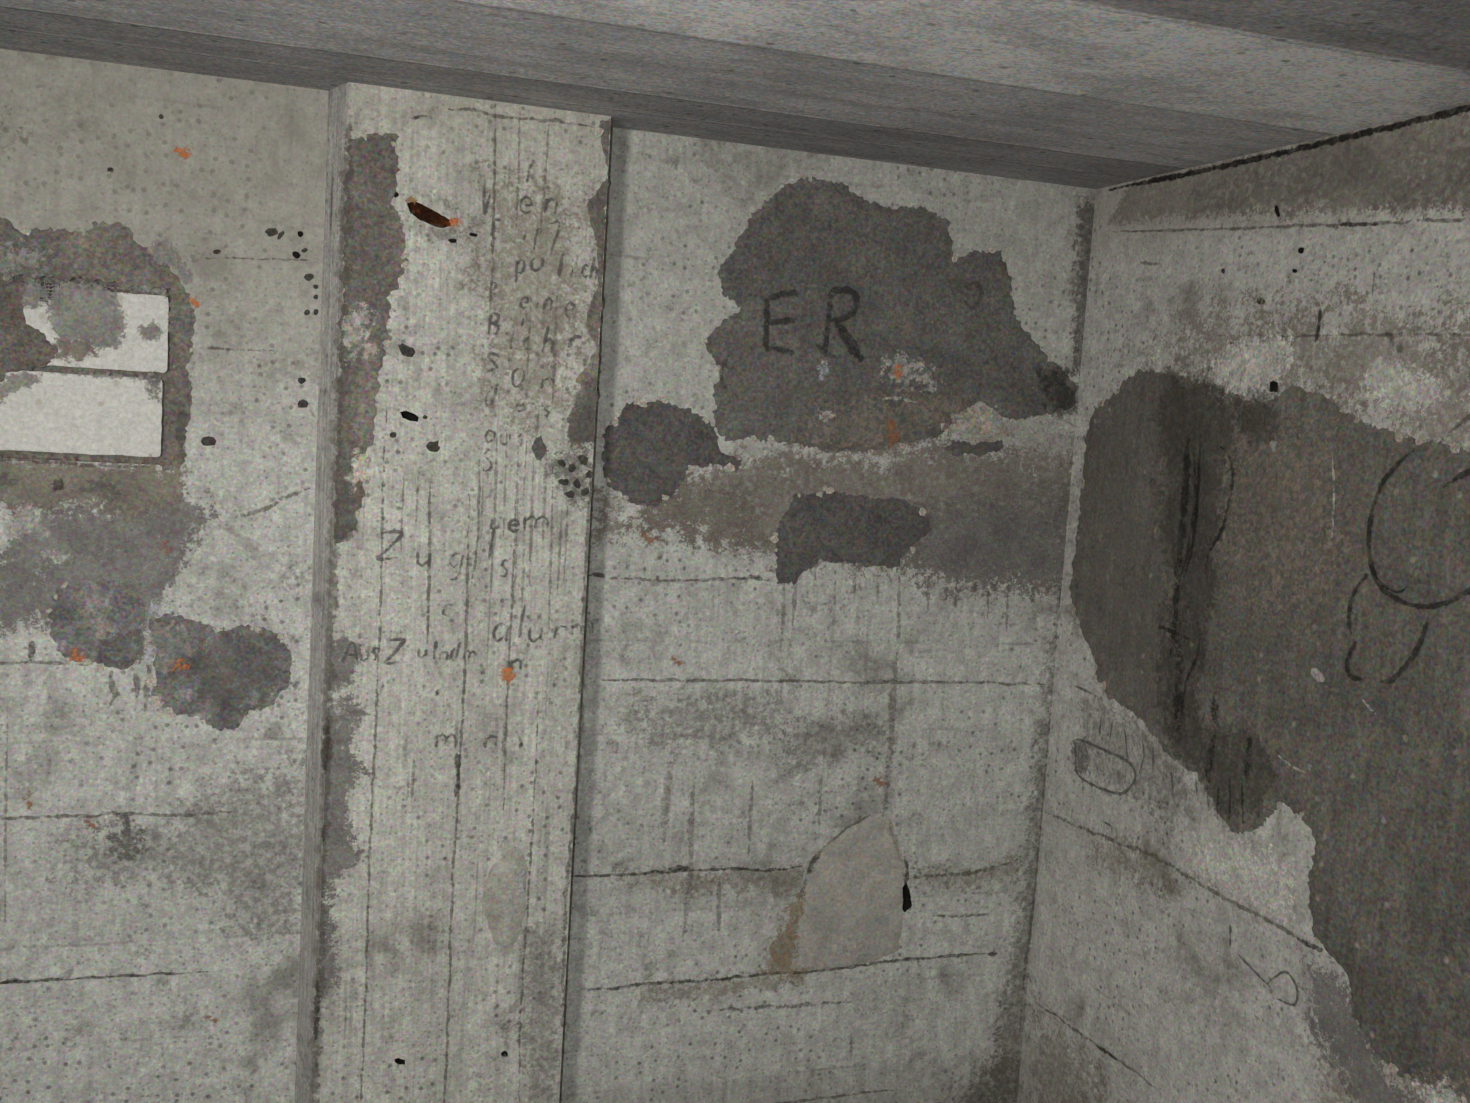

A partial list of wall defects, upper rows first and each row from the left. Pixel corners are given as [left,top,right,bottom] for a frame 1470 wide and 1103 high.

peeling [0,217,216,473]
spalling [265,228,318,315]
spalling [298,377,308,408]
peeling [331,132,427,544]
spalling [426,440,440,452]
peeling [531,120,1078,511]
peeling [770,486,932,585]
peeling [28,579,297,731]
peeling [1069,368,1470,1103]
spalling [902,884,912,912]